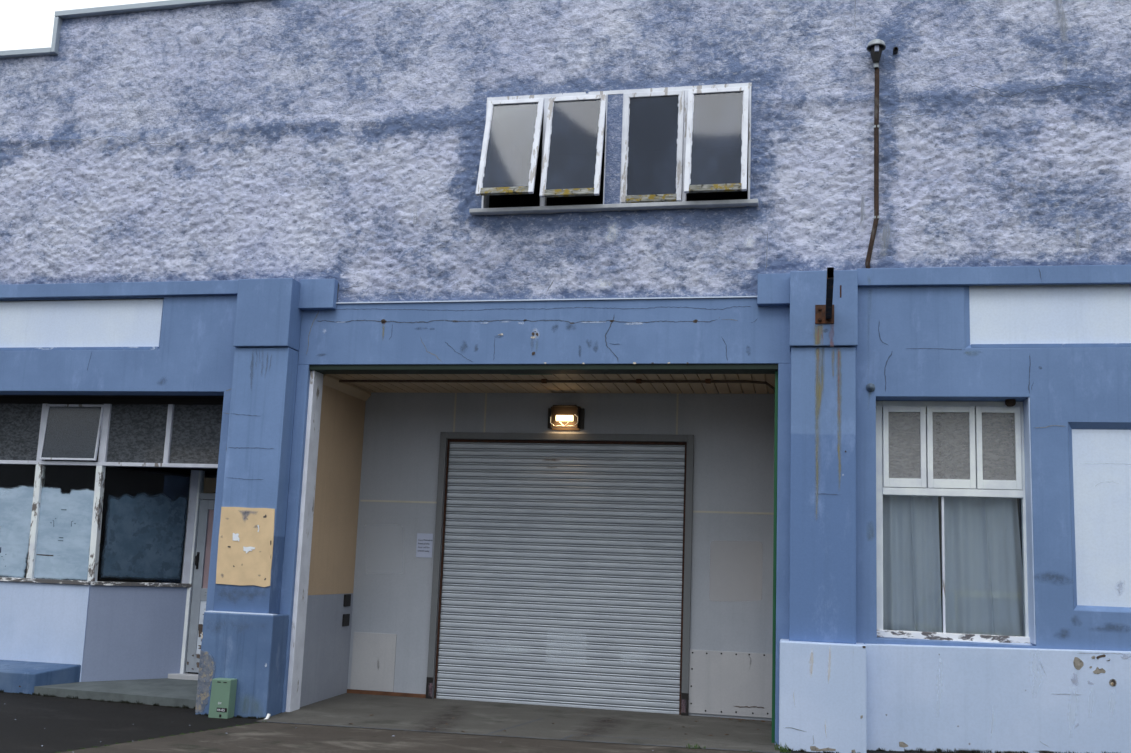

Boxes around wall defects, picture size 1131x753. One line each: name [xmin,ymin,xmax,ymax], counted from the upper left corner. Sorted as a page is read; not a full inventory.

crack [306,282,757,362]
rust [814,326,841,482]
spalling [187,614,215,713]
spalling [1073,654,1117,687]